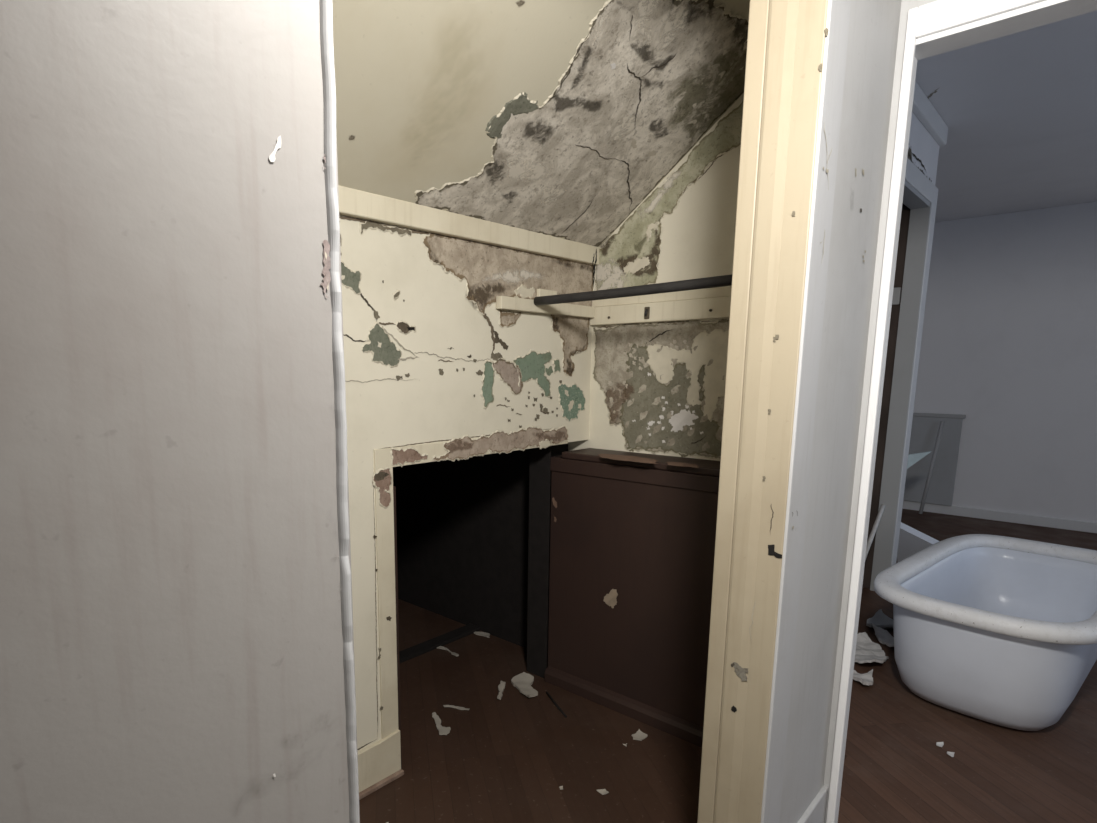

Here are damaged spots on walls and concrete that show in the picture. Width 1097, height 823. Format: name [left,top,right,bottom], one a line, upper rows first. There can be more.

crack [344,293,508,383]
flaking render [359,0,749,509]